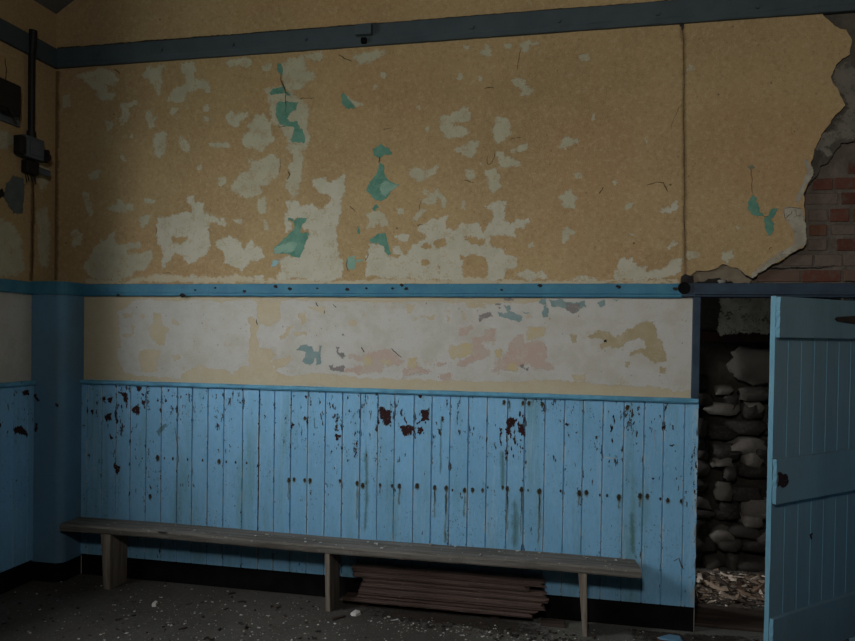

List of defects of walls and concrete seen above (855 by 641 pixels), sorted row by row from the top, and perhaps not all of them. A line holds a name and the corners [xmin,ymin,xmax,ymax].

crack [671,24,685,132]
peeling [76,49,700,284]
spalling [691,12,855,283]
crack [648,154,694,283]
peeling [256,300,281,326]
peeling [402,297,514,381]
peeling [84,371,187,424]
peeling [377,407,444,439]
peeling [499,401,525,460]
corrosion [433,485,488,538]